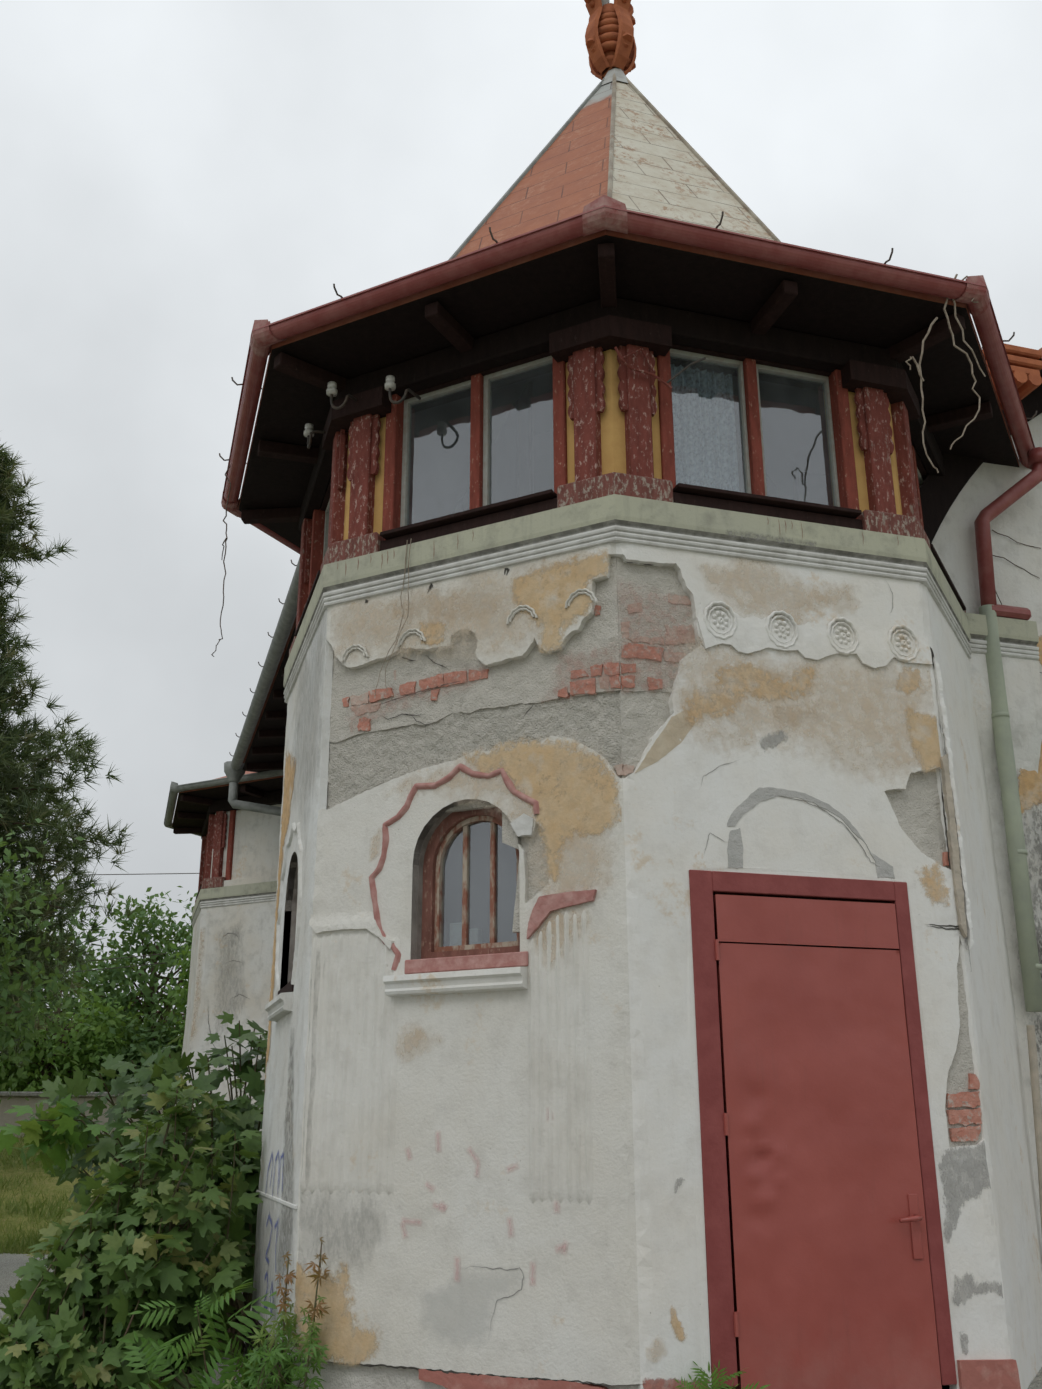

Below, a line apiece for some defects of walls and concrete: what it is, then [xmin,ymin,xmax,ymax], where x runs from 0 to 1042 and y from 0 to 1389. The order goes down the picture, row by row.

flaking render [326,552,815,933]
peeling [1018,742,1042,813]
flaking render [885,657,982,1147]
water stain [1024,800,1042,964]
water stain [939,1143,991,1241]
peeling [294,1263,709,1389]